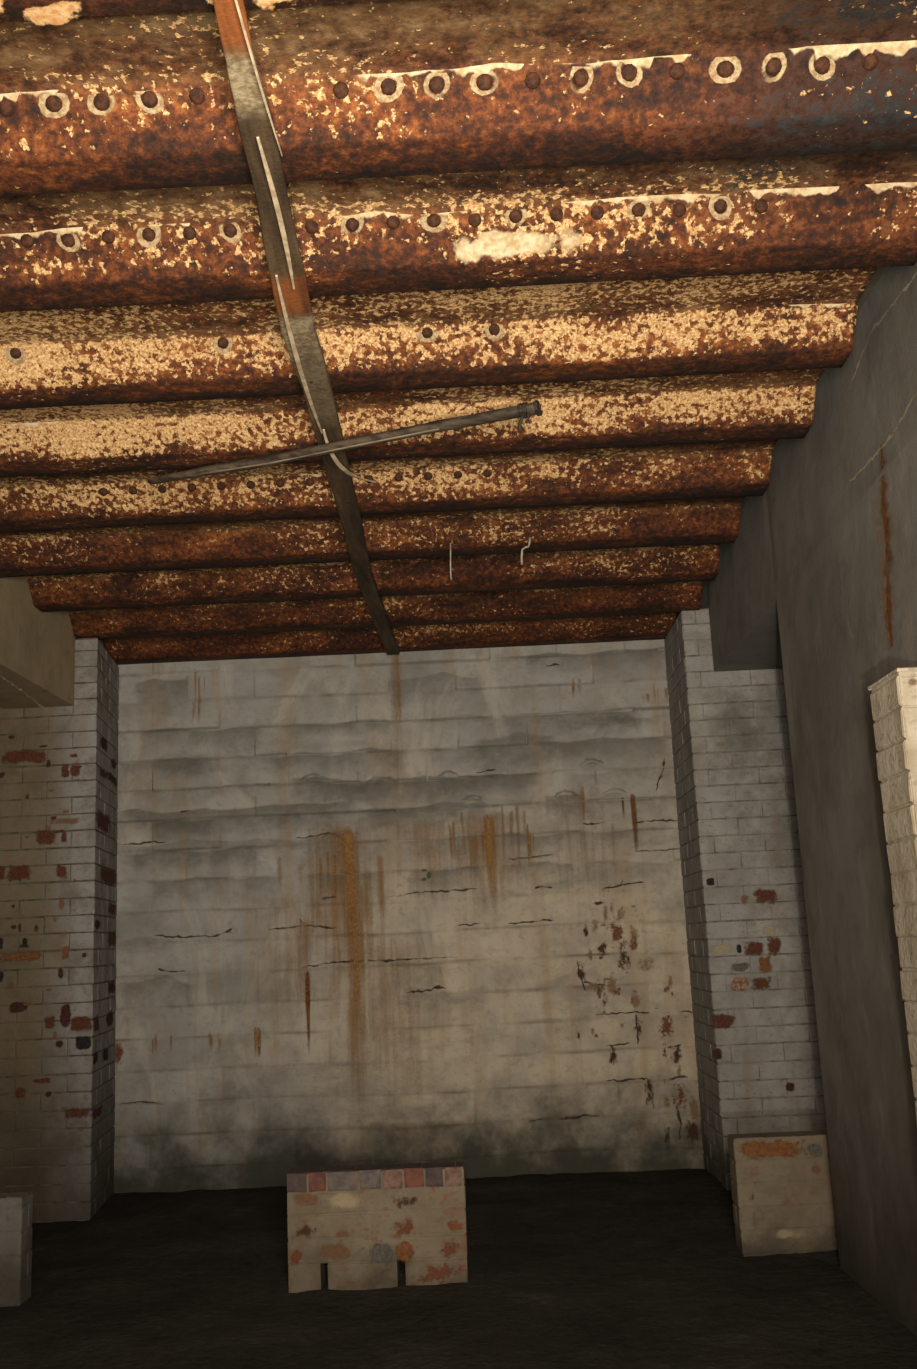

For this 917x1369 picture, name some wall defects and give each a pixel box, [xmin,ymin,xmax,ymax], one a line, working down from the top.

peeling [23,1,81,25]
peeling [254,0,291,10]
peeling [454,229,582,263]
rust [880,445,892,563]
rust [472,807,531,878]
crack [602,761,676,890]
crack [155,928,232,972]
rust [320,831,362,1040]
crack [268,854,554,993]
spalling [578,901,653,1013]
peeling [715,927,781,991]
peeling [45,982,123,1064]